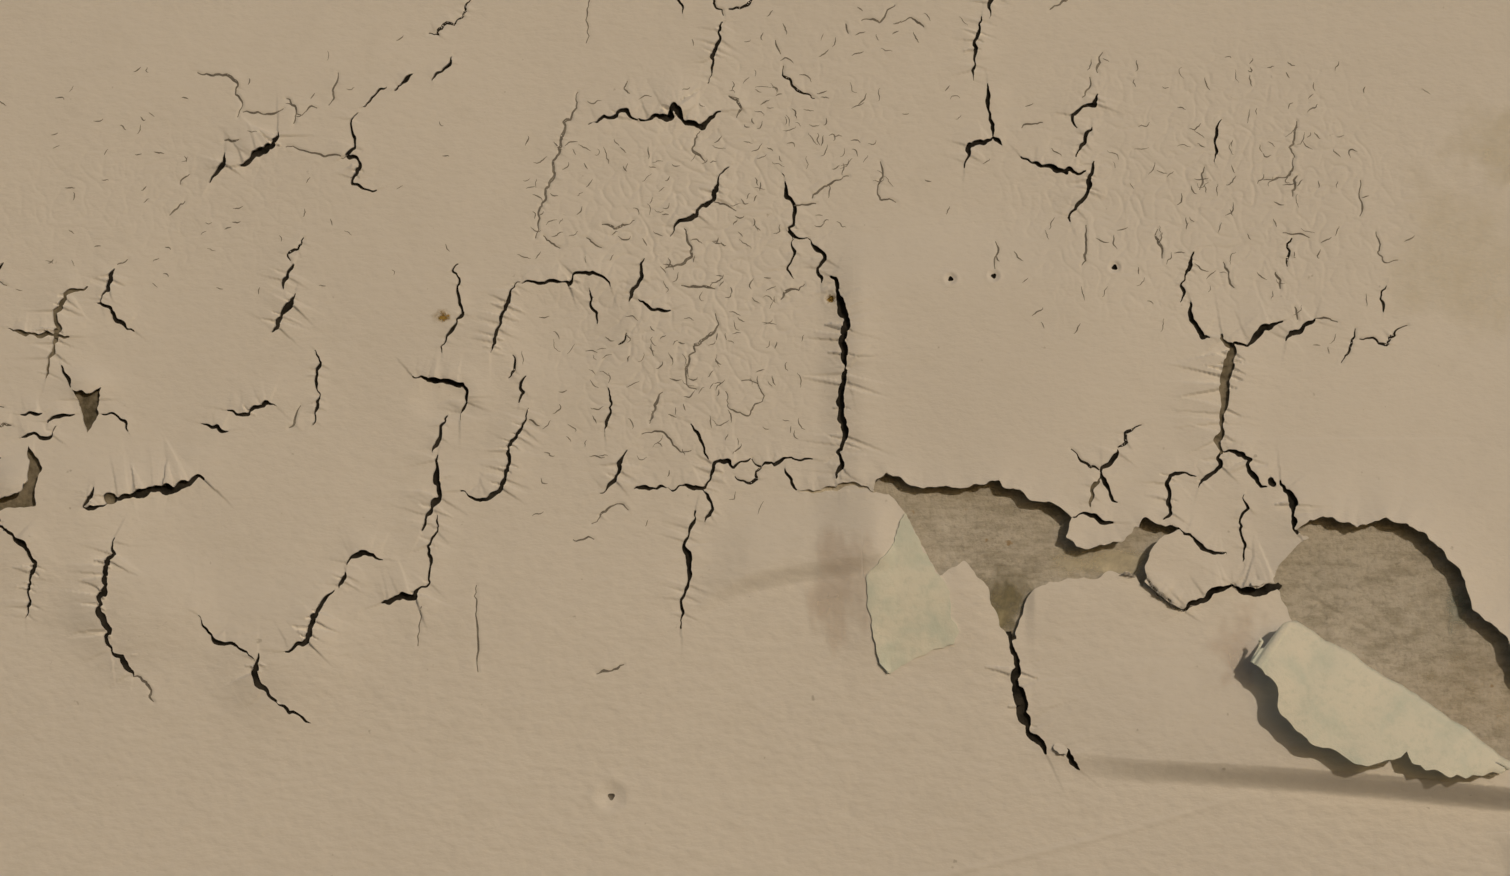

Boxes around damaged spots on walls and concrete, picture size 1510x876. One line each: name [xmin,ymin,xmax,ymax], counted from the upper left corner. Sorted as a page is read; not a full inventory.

crack [170,0,471,215]
crack [964,0,1103,265]
crack [0,520,37,617]
crack [0,259,135,458]
crack [83,474,205,702]
crack [202,350,322,433]
crack [198,550,383,723]
crack [382,0,896,644]
crack [1006,631,1080,770]
crack [1071,425,1141,525]
peeling [801,315,1510,778]
crack [1146,180,1407,612]